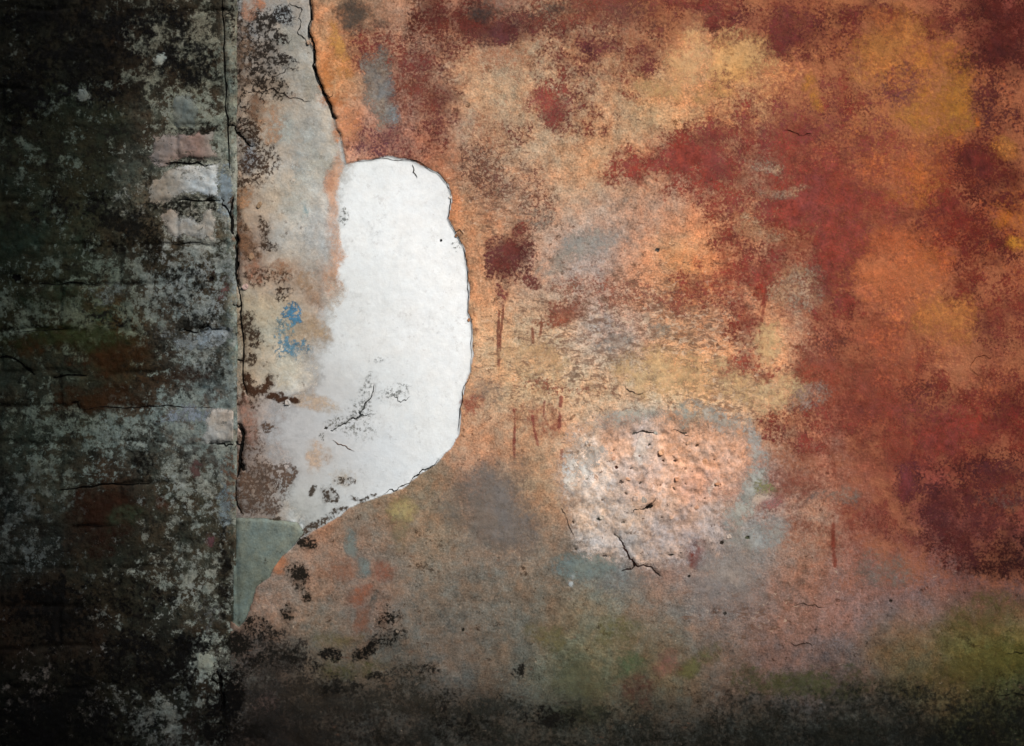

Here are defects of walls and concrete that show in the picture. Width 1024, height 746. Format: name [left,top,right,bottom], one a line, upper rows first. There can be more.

water stain [0,0,349,310]
crack [160,0,337,395]
water stain [85,281,132,328]
crack [346,158,472,428]
corrosion [483,221,542,365]
corrosion [532,299,583,344]
peeling [202,0,1024,581]
crack [214,425,245,513]
water stain [0,308,1024,746]
corrosion [513,396,563,445]
crack [614,534,661,576]
corrosion [686,539,705,568]